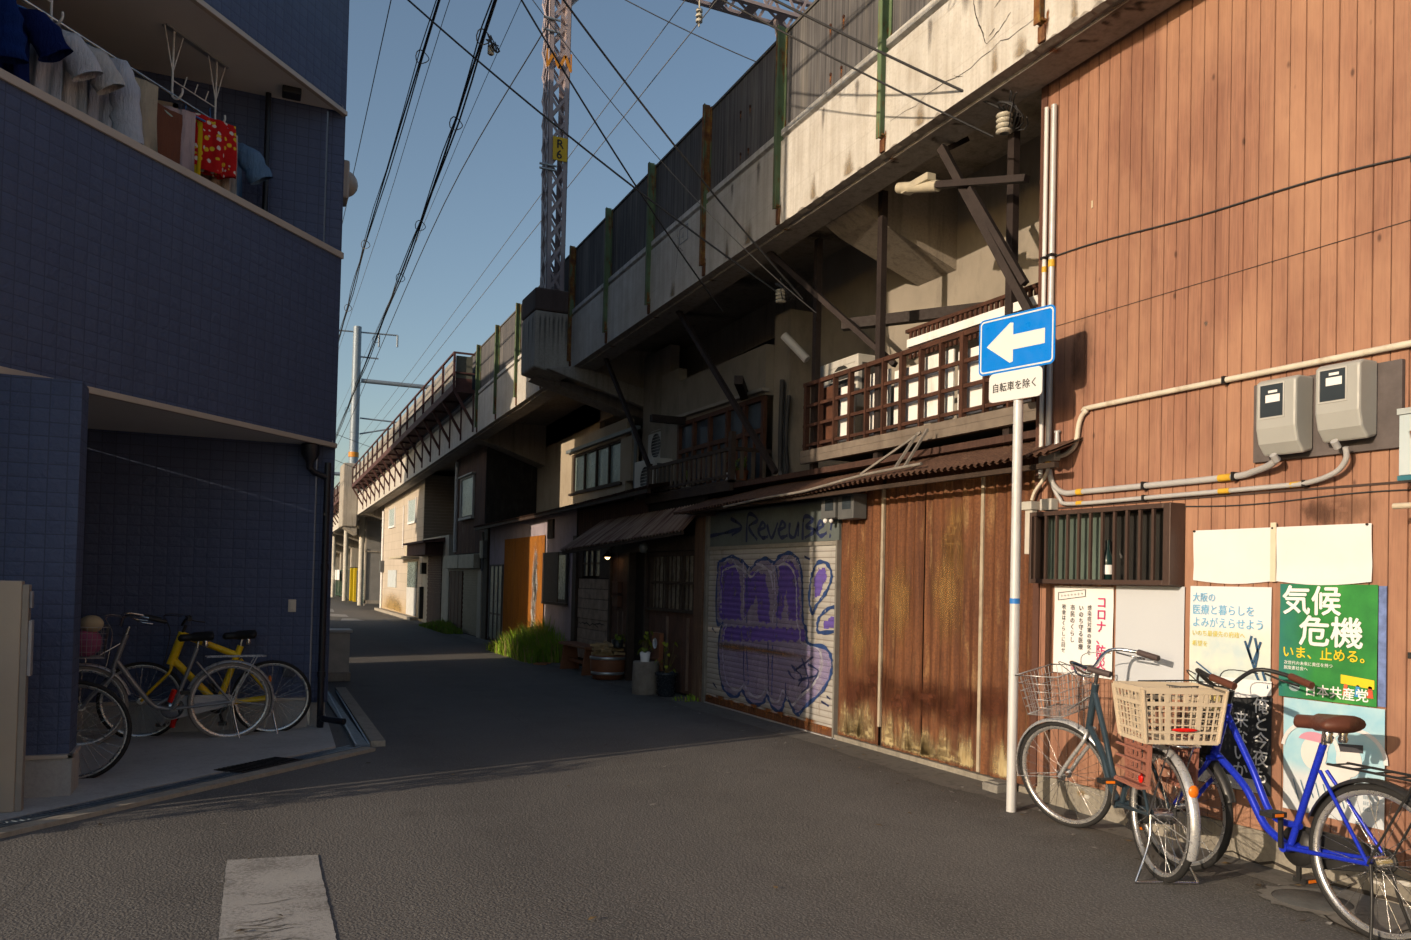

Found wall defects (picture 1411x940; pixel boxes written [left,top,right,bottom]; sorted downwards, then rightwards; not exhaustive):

crack [891,0,1030,121]
rust [847,626,1006,727]